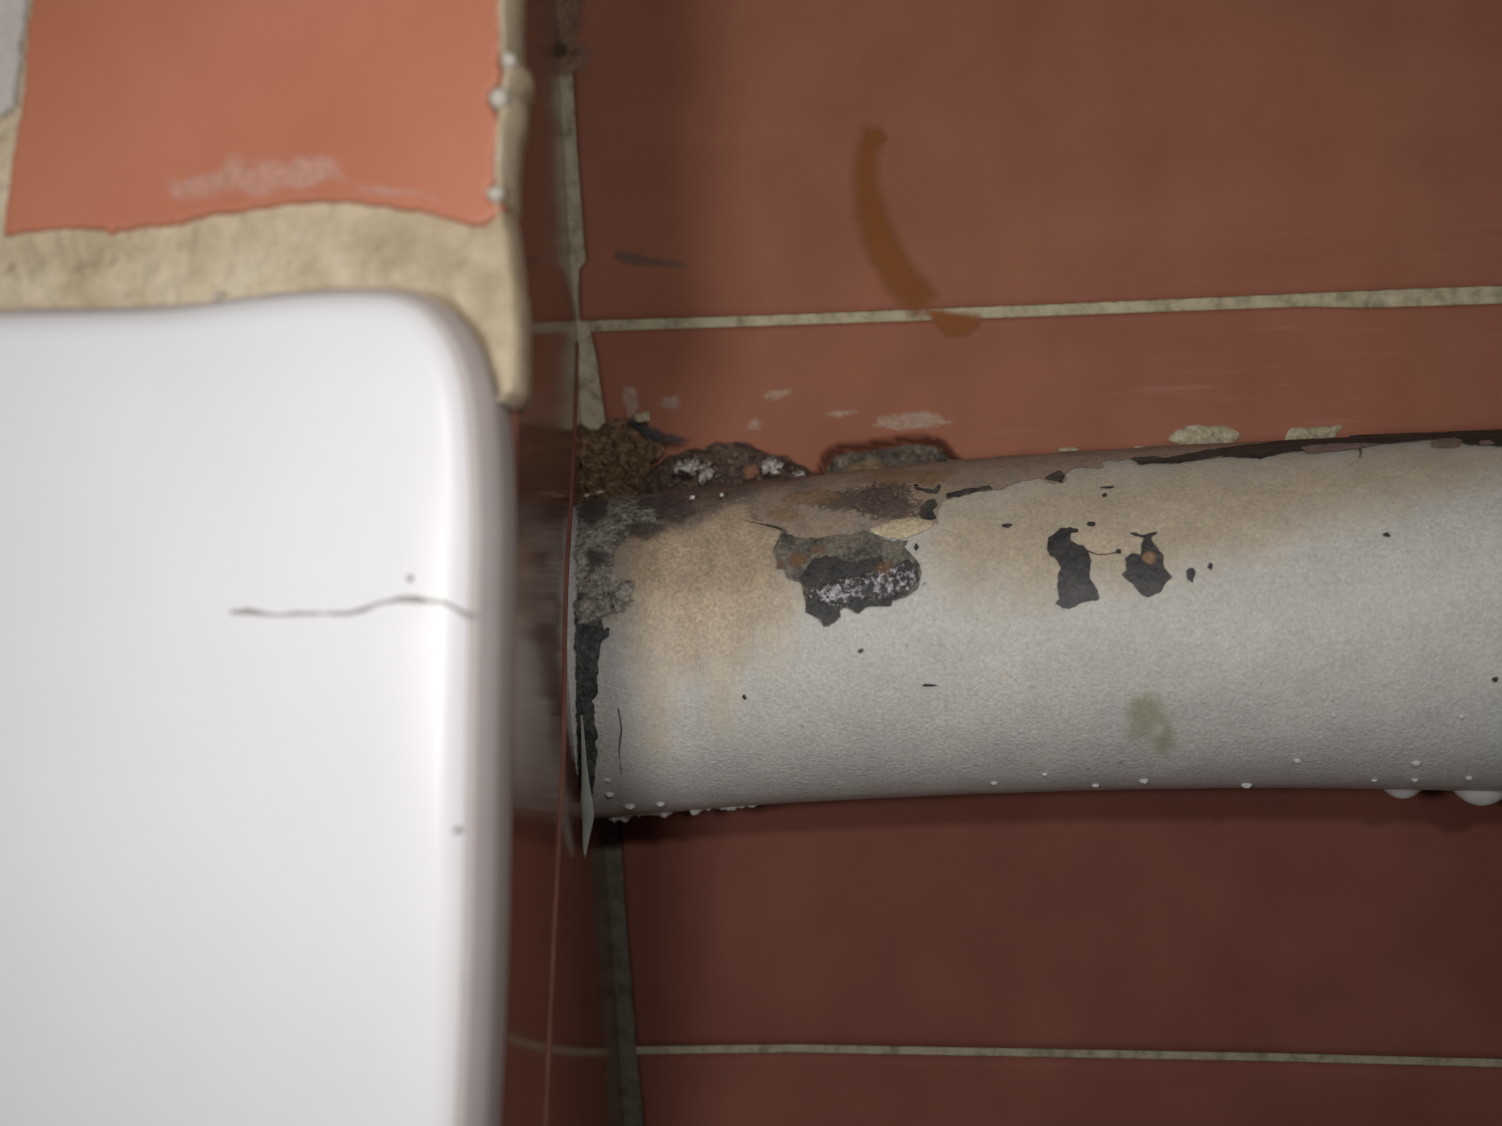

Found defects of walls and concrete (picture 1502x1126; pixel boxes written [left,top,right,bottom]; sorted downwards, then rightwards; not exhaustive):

rust [856,130,978,336]
rust [609,476,925,661]
peeling [743,425,1502,551]
peeling [1047,521,1213,609]
peeling [574,611,610,795]